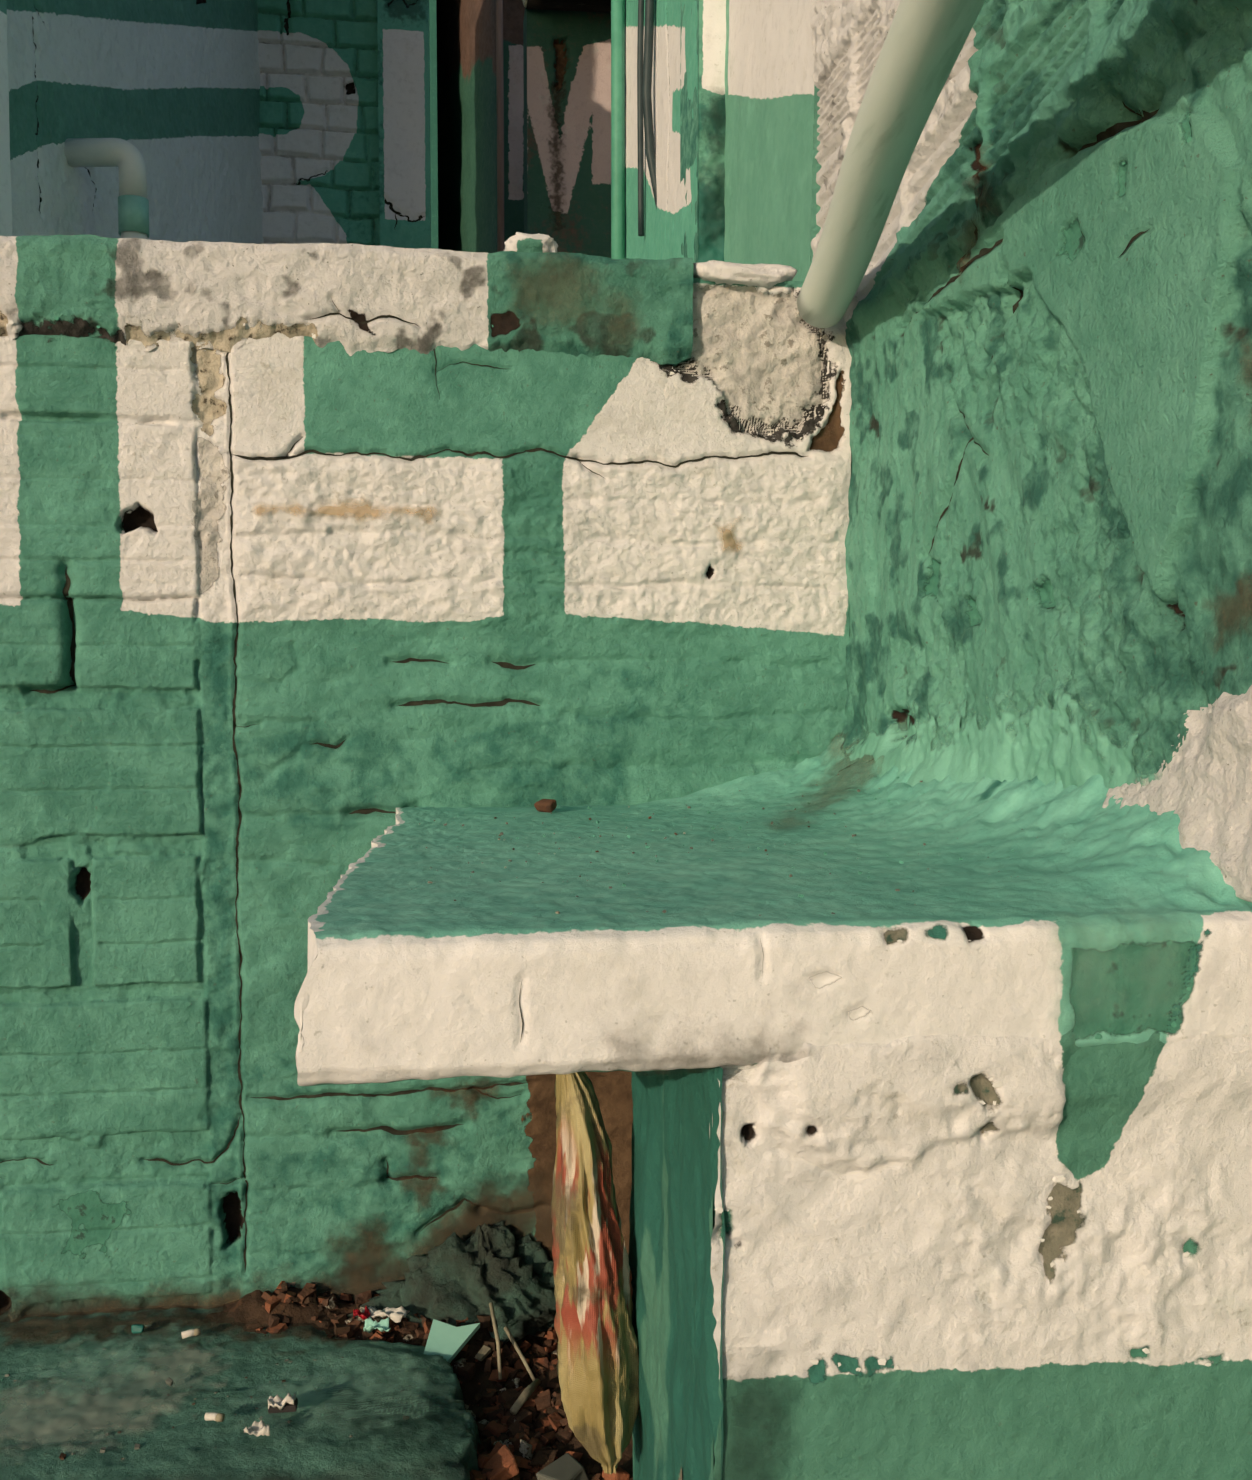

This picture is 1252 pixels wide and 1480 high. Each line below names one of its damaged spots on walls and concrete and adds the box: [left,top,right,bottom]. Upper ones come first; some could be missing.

crack [283,0,291,36]
crack [305,298,503,398]
spalling [675,284,846,452]
spalling [0,311,318,594]
crack [30,568,76,694]
crack [144,352,807,1270]
water stain [311,1074,557,1304]